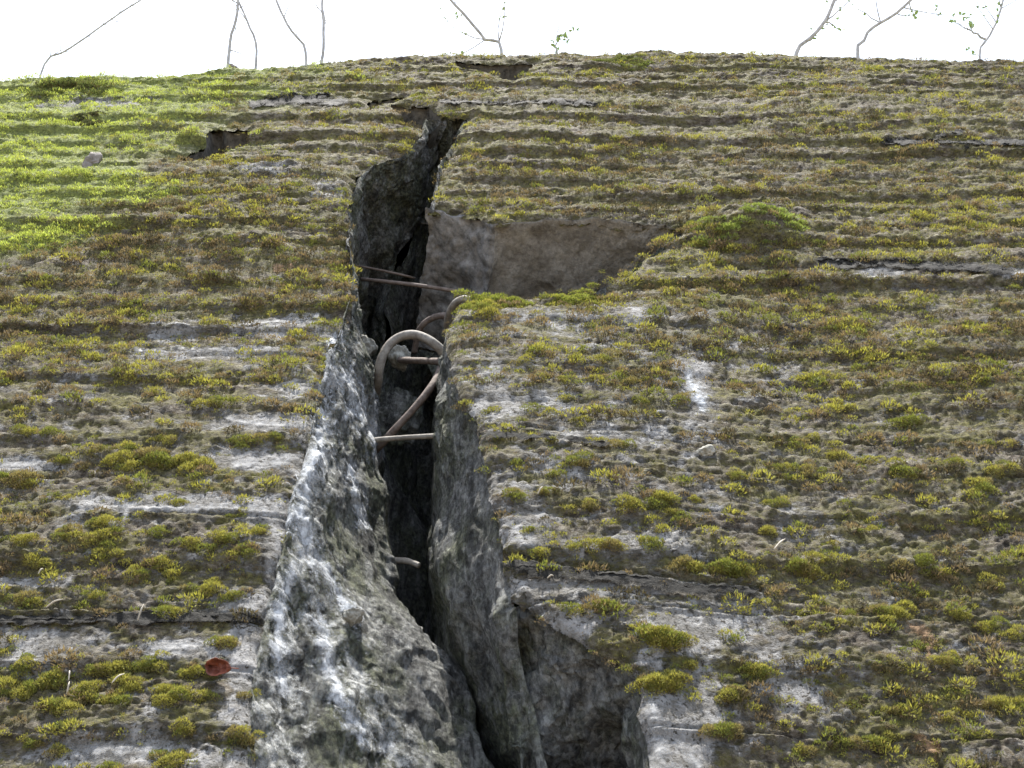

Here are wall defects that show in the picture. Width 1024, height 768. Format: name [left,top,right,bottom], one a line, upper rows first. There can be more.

spalling [180,130,250,161]
crack [881,129,1024,150]
crack [816,256,1013,277]
spalling [416,207,683,378]
crack [0,62,757,768]